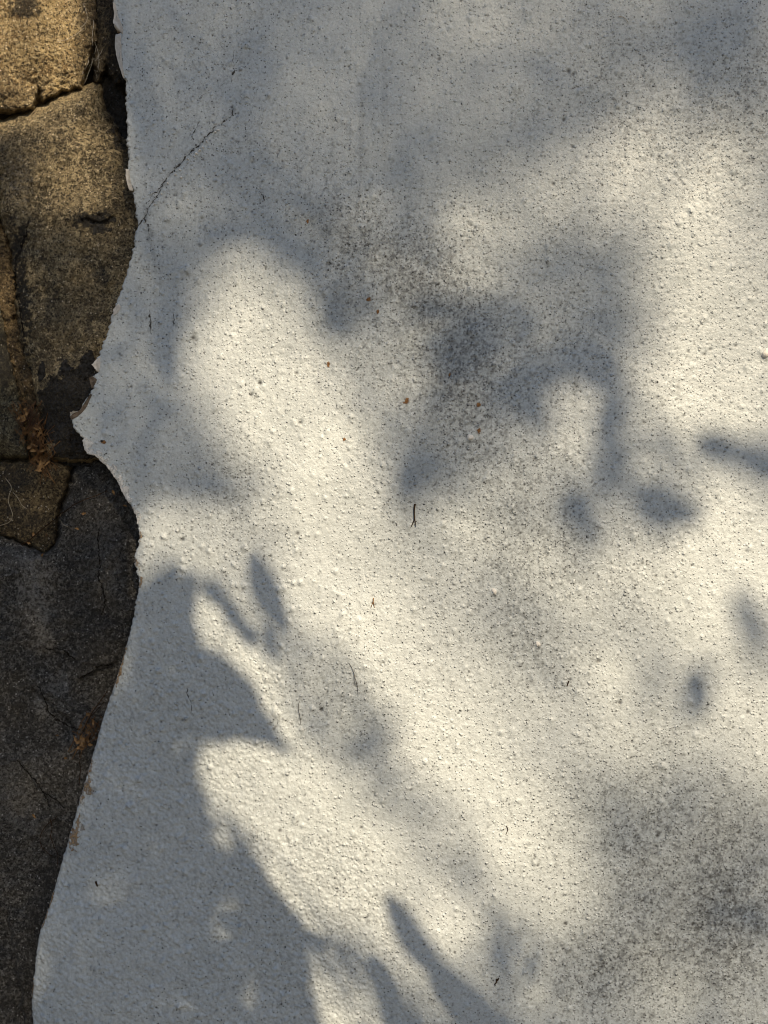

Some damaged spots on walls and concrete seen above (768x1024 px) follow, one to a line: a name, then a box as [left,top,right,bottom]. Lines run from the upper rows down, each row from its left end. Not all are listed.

crack [138,107,233,232]